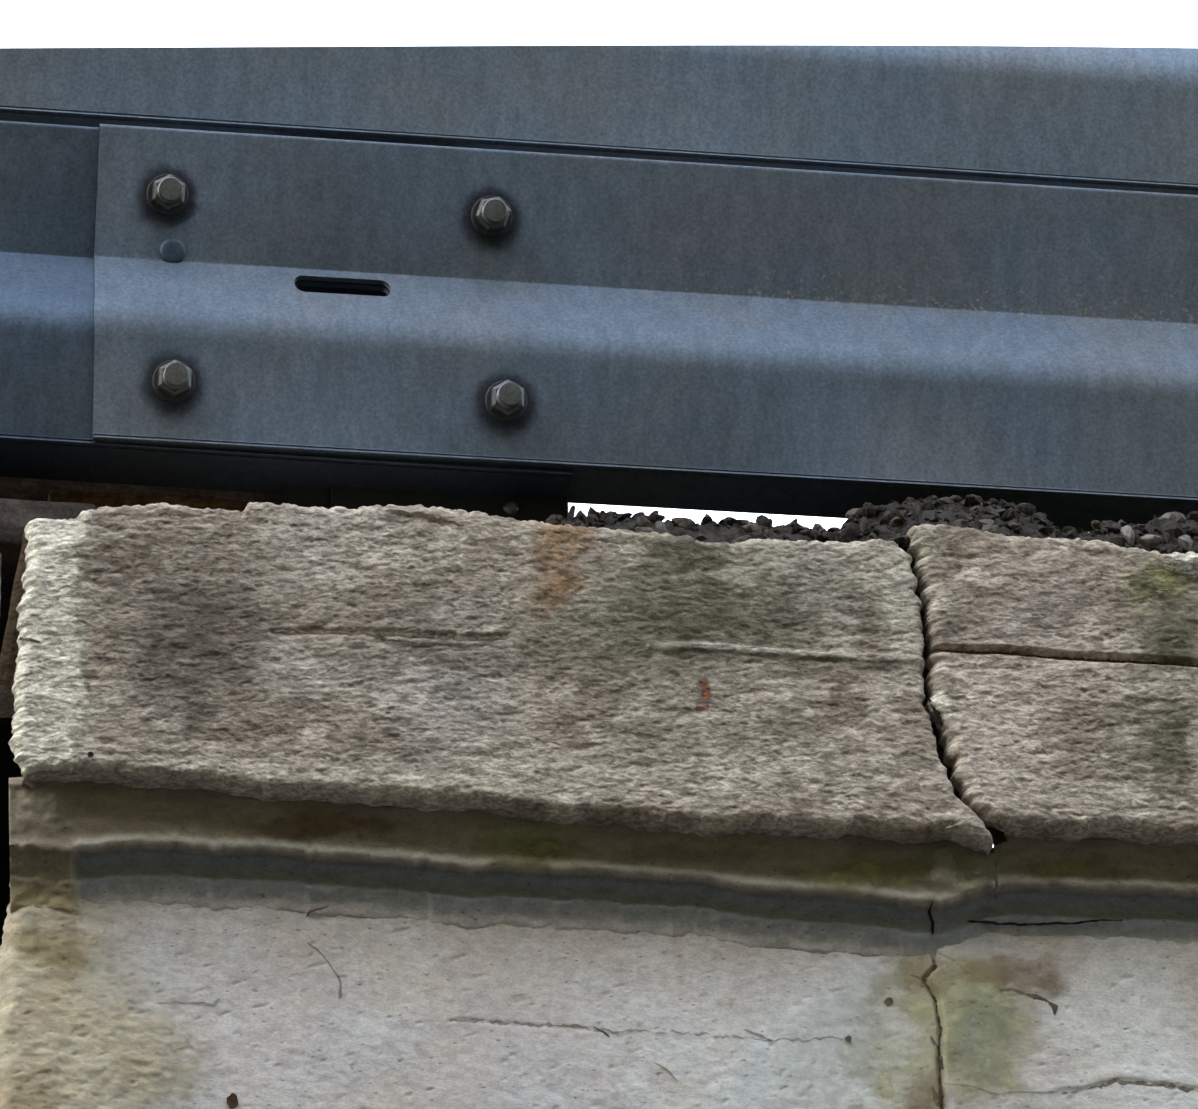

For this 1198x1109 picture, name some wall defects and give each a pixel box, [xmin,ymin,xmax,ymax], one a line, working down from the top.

corrosion [541,524,588,546]
water stain [1159,551,1198,580]
water stain [1157,602,1198,663]
crack [902,532,1198,800]
crack [986,827,1007,845]
crack [968,918,1123,926]
crack [910,901,945,1109]
crack [998,988,1058,1015]
water stain [875,959,1061,1109]
crack [1061,1078,1198,1094]